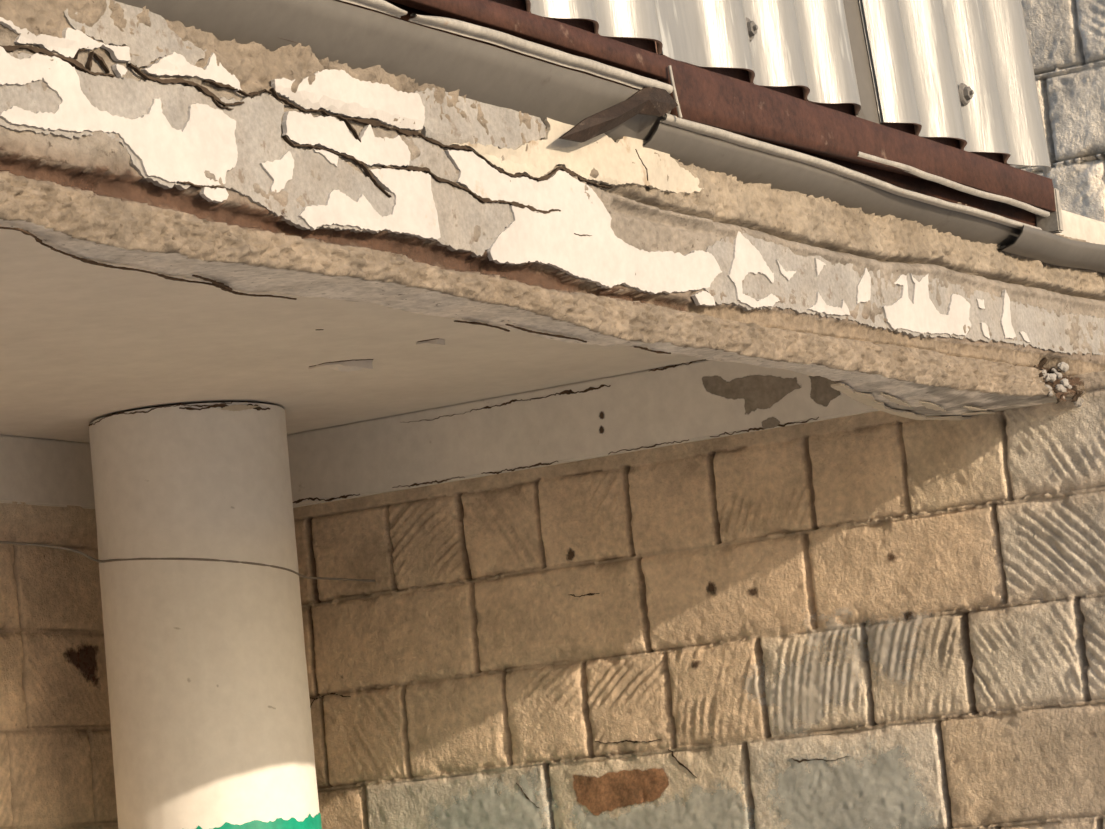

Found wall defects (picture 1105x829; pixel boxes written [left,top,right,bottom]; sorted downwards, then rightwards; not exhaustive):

crack [0,45,613,214]
corrosion [0,147,582,291]
peeling [0,0,1105,407]
crack [0,227,297,300]
corrosion [593,287,686,311]
crack [634,346,706,371]
crack [404,384,611,423]
peeling [702,375,841,429]
water stain [64,645,99,686]